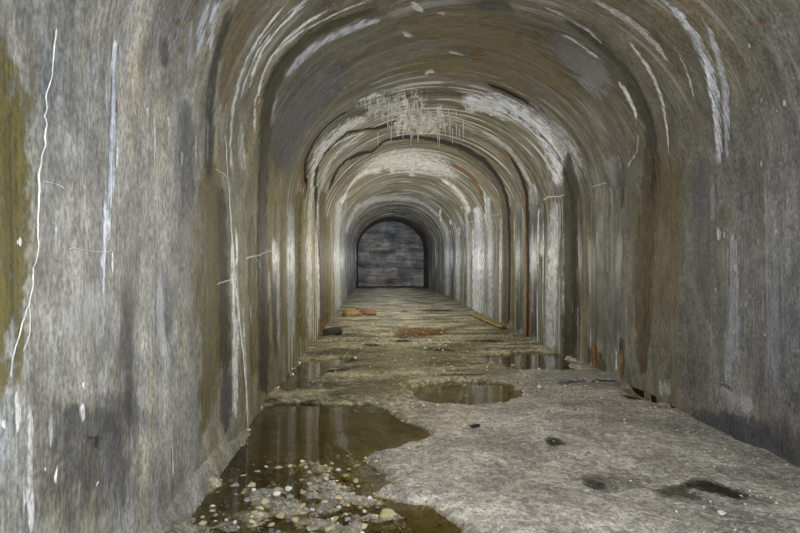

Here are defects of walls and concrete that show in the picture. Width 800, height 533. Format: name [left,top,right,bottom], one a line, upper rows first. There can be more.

crack [11,29,65,376]
water stain [101,39,122,294]
water stain [195,0,379,177]
water stain [267,88,451,353]
crack [301,112,573,337]
water stain [663,1,730,162]